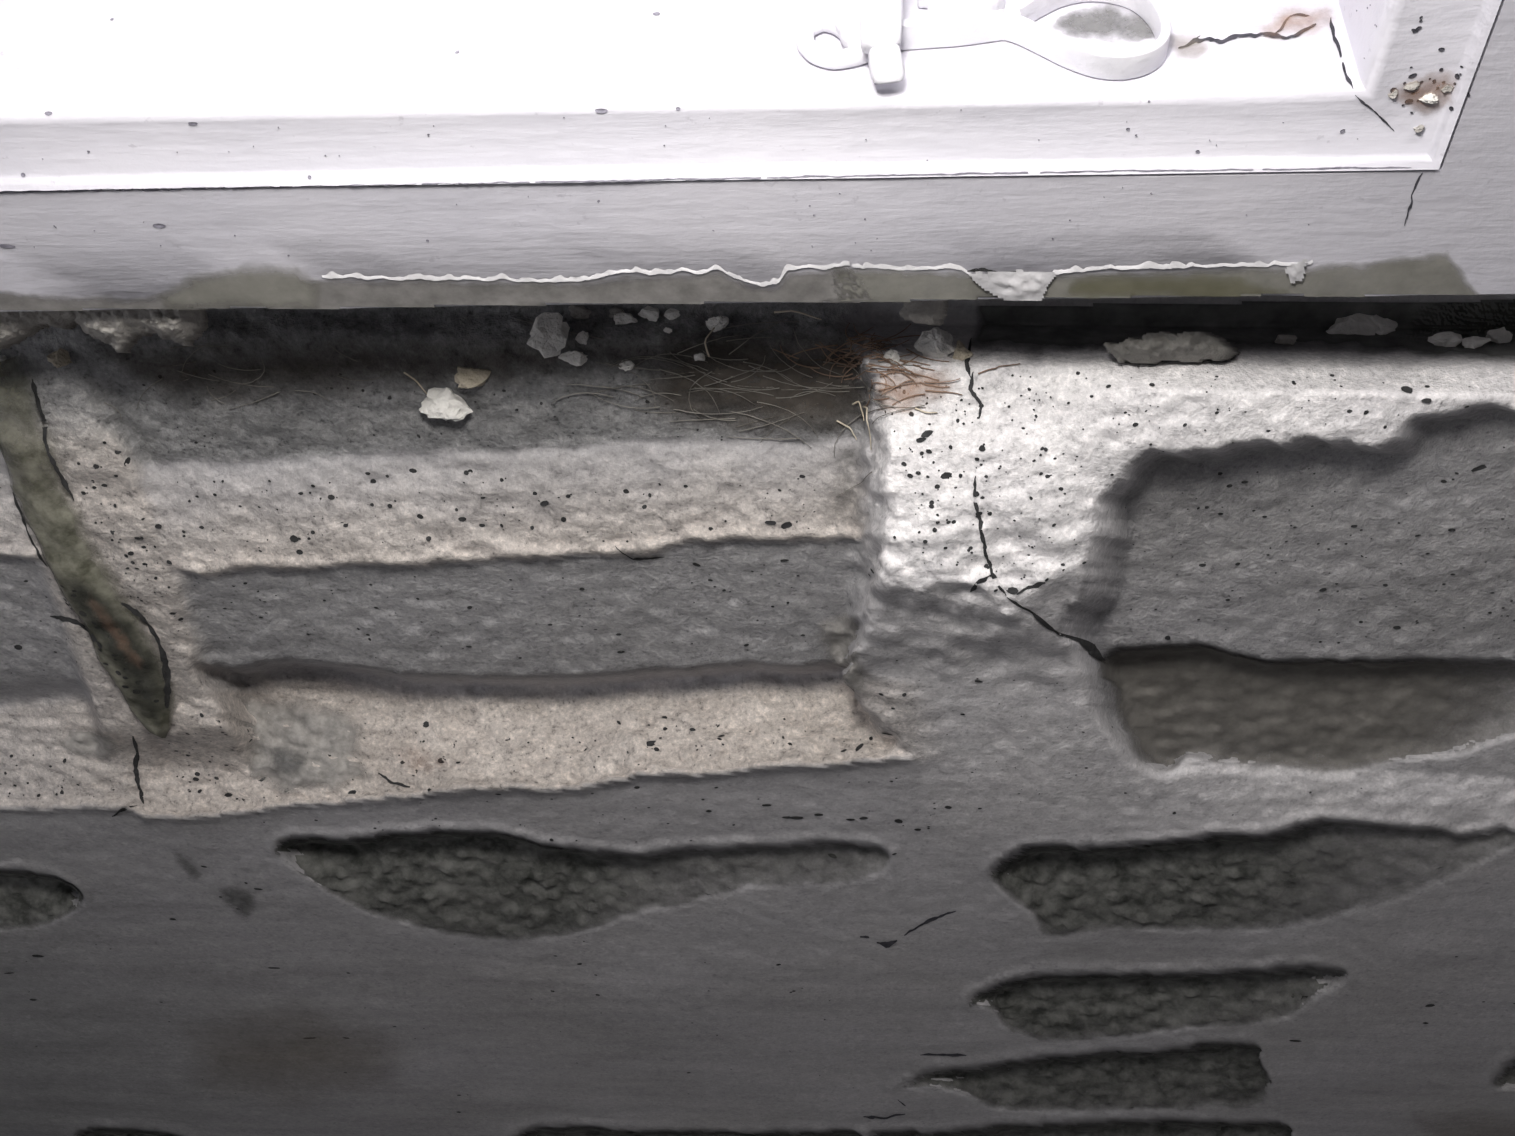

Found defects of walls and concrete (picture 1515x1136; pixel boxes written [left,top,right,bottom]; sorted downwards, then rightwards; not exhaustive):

crack [1178,13,1394,131]
rust [1406,82,1445,104]
crack [0,167,1423,226]
peeling [0,255,1476,311]
crack [967,266,1016,274]
crack [964,338,983,419]
crack [970,476,1105,662]
spalling [1102,645,1514,768]
spalling [0,871,83,928]
spalling [277,831,889,939]
spalling [991,823,1407,935]
spalling [521,968,1347,1136]